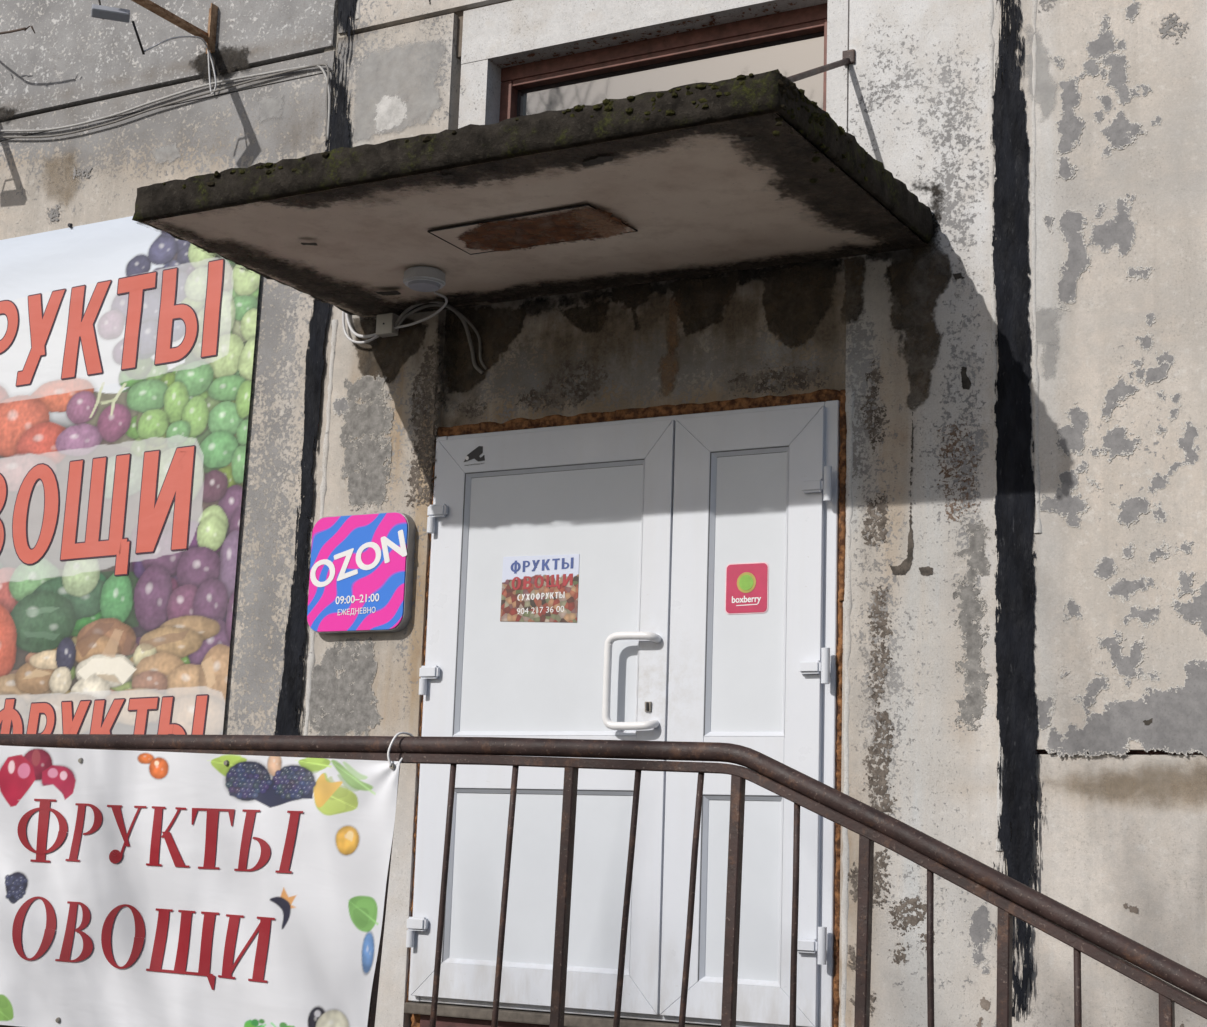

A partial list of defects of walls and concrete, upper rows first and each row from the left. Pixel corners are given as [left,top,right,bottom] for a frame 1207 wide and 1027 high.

peeling [1125,0,1142,23]
peeling [1151,12,1189,44]
peeling [1049,12,1165,183]
water stain [140,112,952,419]
corrosion [459,207,634,252]
peeling [1042,193,1155,311]
peeling [1035,311,1207,758]